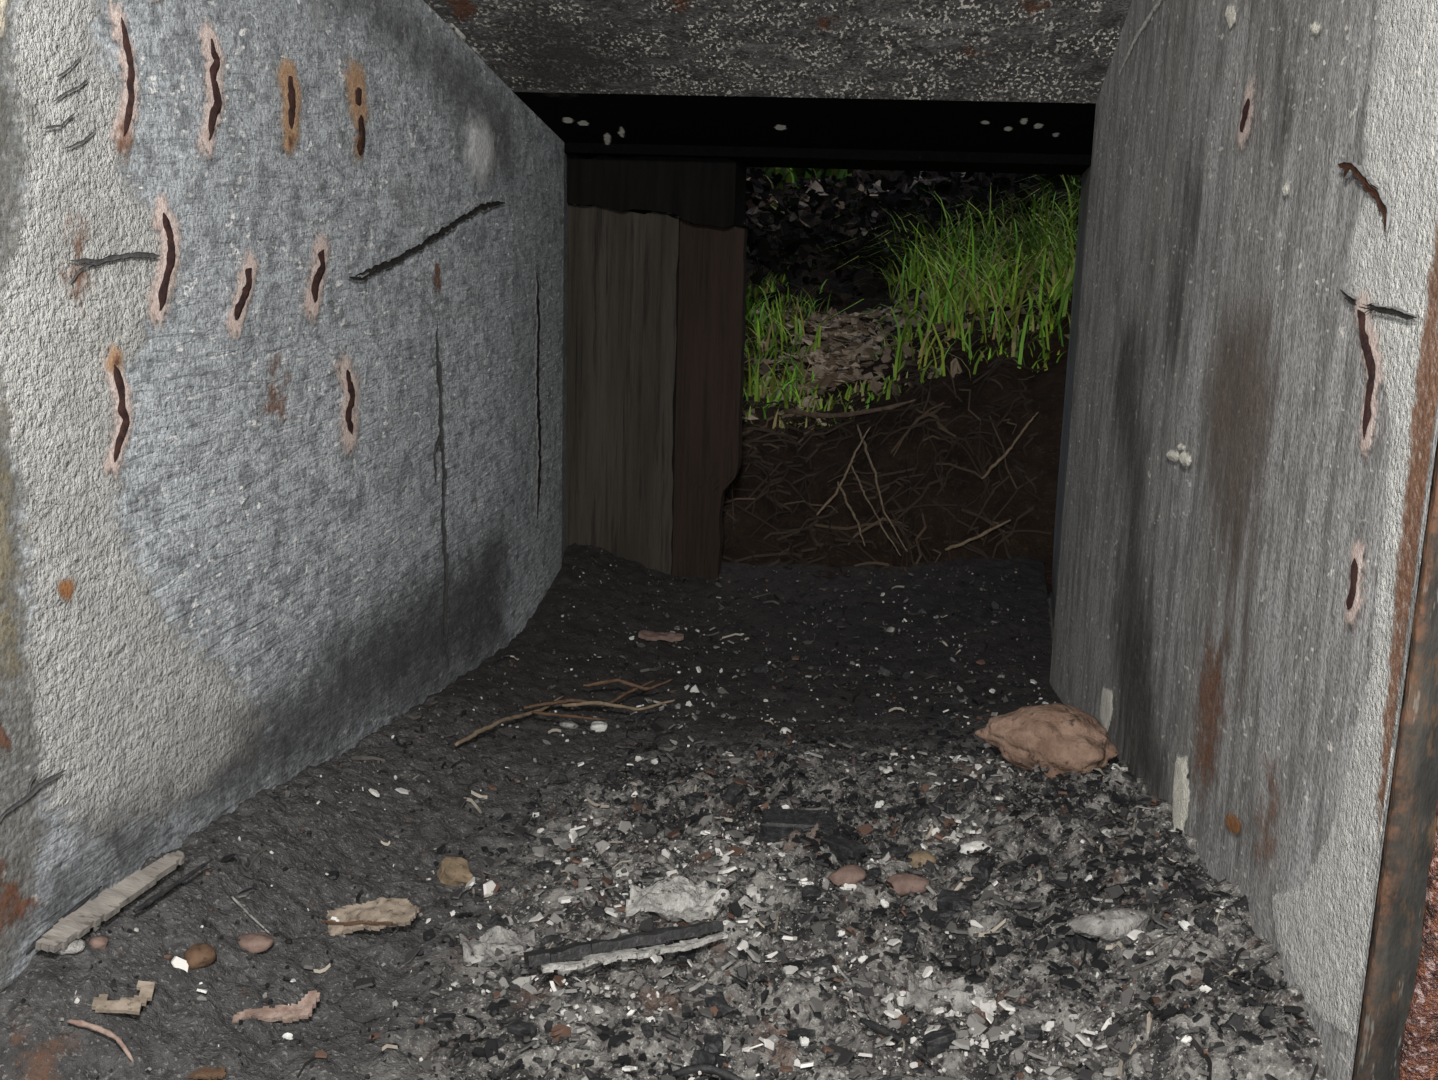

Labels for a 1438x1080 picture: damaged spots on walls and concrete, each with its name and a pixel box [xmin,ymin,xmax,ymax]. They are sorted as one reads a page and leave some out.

crack [1338,161,1391,231]
crack [70,252,161,283]
crack [349,201,505,281]
crack [1340,289,1418,318]